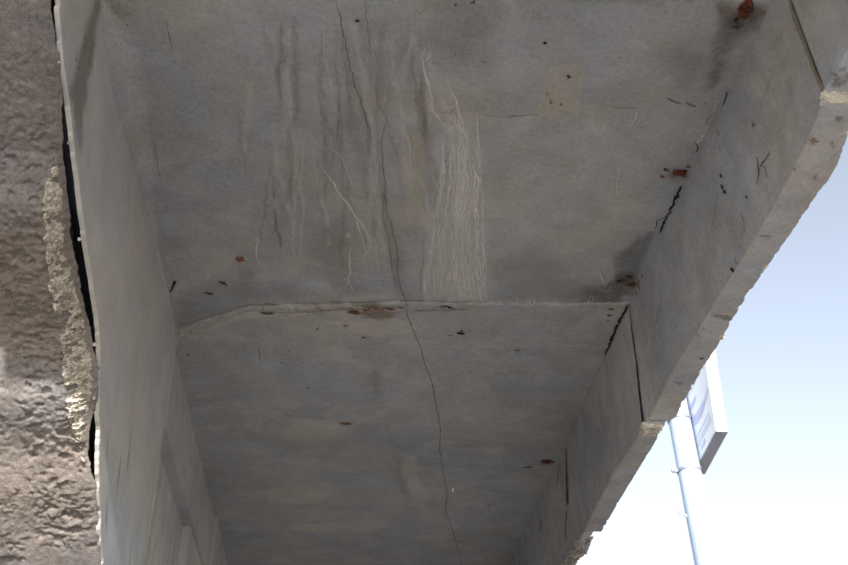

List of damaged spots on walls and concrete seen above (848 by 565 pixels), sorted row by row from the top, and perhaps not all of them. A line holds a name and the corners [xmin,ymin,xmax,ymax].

corrosion [731,0,754,29]
spalling [820,89,848,107]
corrosion [660,165,691,178]
crack [656,186,682,233]
crack [337,1,461,563]
spalling [42,165,99,463]
corrosion [295,307,404,315]
crack [599,303,644,422]
spalling [561,535,594,565]